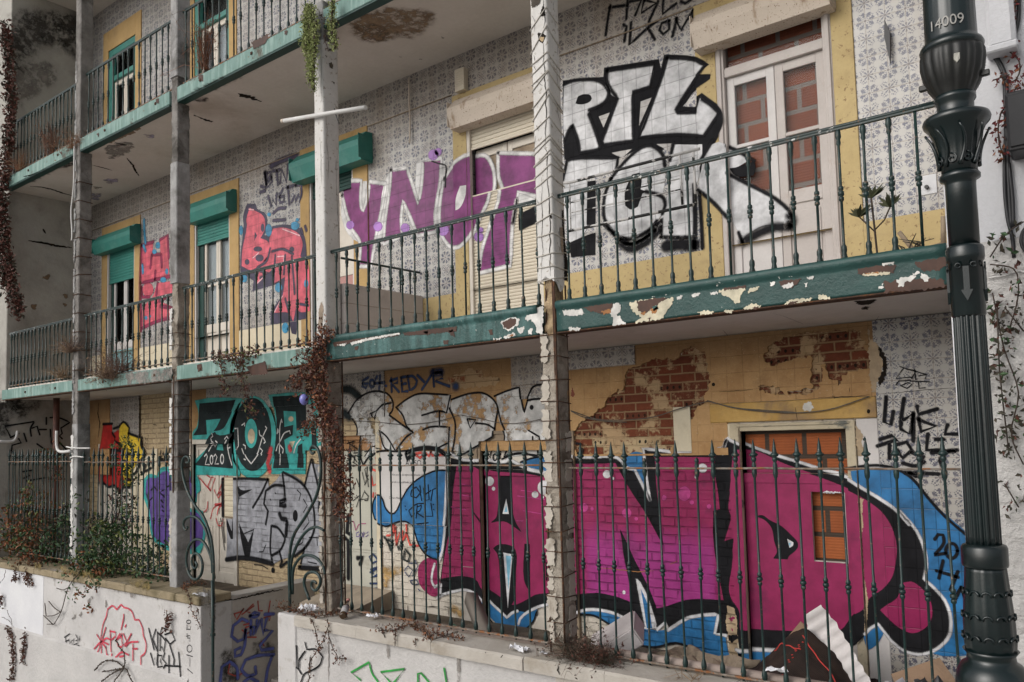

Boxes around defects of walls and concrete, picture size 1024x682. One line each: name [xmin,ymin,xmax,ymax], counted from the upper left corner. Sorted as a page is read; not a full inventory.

leakage [350,8,434,41]
crack [28,229,72,248]
peeling [854,243,947,310]
peeling [333,326,457,350]
spalling [759,328,887,411]
spalling [488,210,830,656]